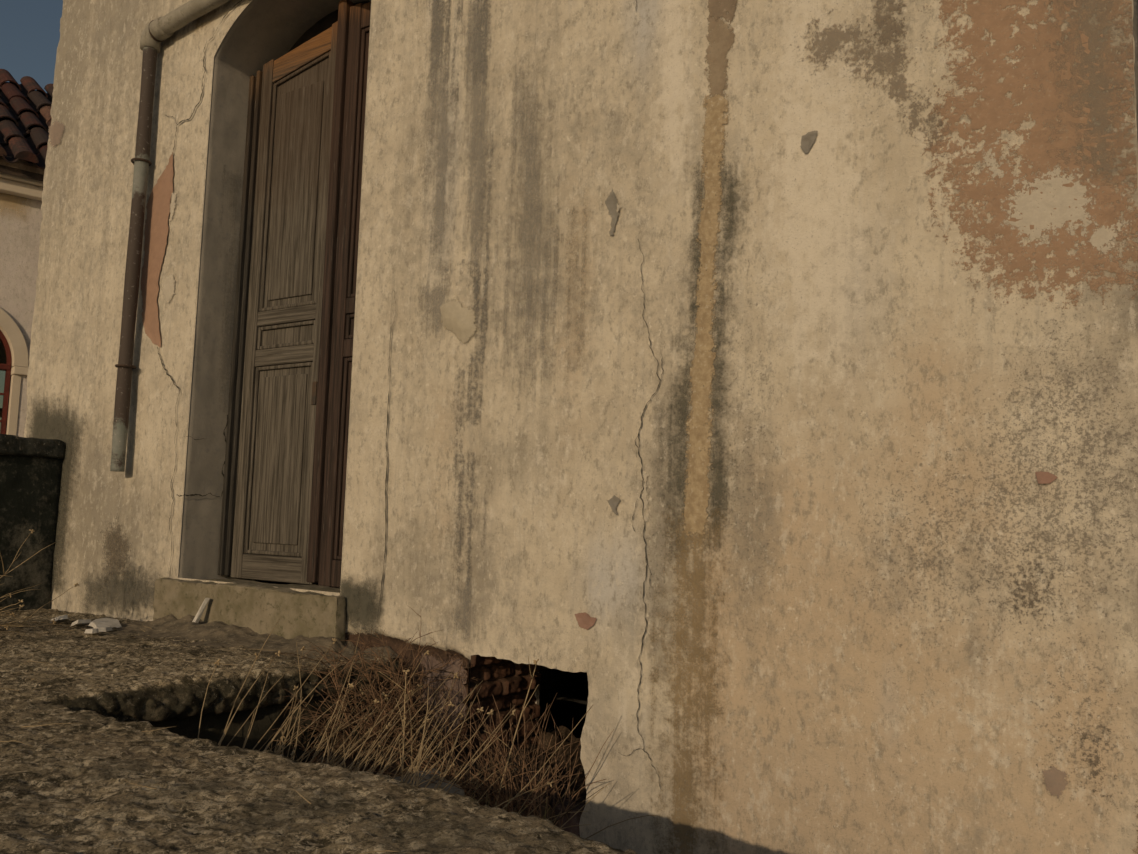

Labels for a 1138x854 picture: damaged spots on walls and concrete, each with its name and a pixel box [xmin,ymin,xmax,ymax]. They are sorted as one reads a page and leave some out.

peeling [141,152,178,347]
damp [430,0,450,270]
damp [457,0,489,423]
peeling [798,0,1138,315]
spalling [345,632,469,759]
damp [454,454,474,633]
crack [621,239,664,789]
damp [653,94,738,854]